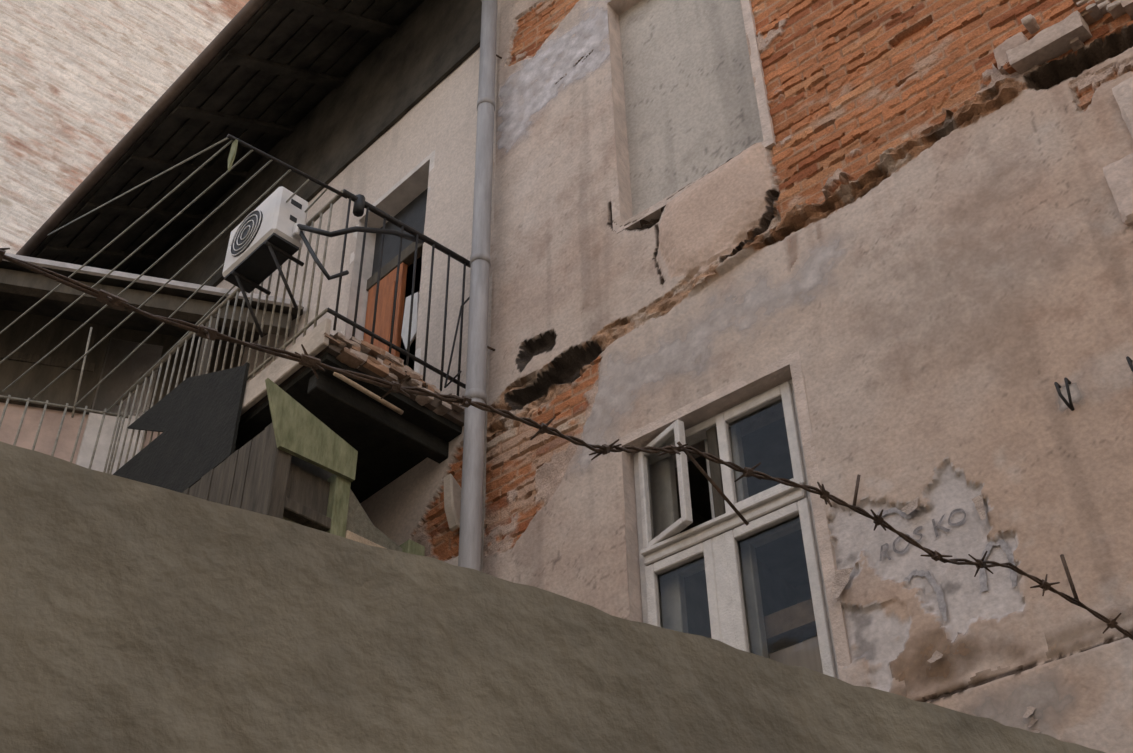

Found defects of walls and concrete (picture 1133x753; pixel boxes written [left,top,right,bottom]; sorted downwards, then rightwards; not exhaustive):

flaking render [505,0,579,67]
flaking render [740,0,1133,225]
crack [607,184,689,285]
flaking render [409,441,463,562]
flaking render [483,330,603,557]
peeling [828,459,1026,692]